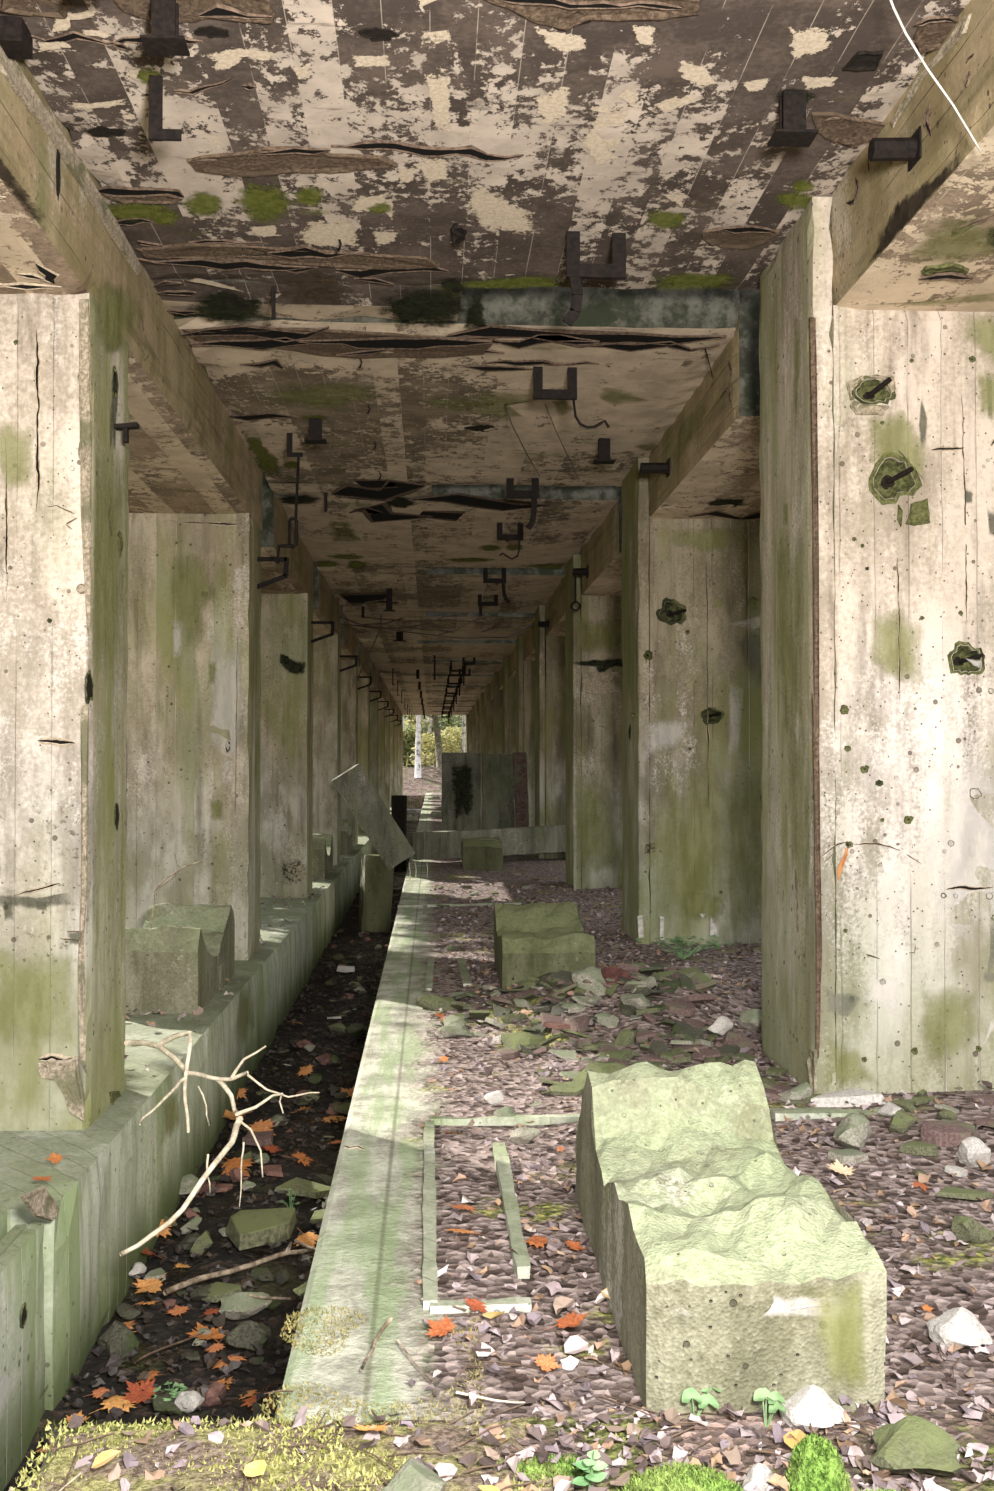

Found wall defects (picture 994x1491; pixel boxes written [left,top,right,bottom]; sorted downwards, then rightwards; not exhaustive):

spalling [353,27,400,67]
peeling [421,30,451,47]
peeling [788,27,832,59]
peeling [744,78,769,92]
peeling [802,76,838,90]
spalling [811,13,972,146]
peeling [533,86,572,126]
peeling [578,61,718,166]
crack [331,140,524,162]
peeling [451,177,540,244]
spalling [701,225,780,250]
water stain [0,430,27,481]